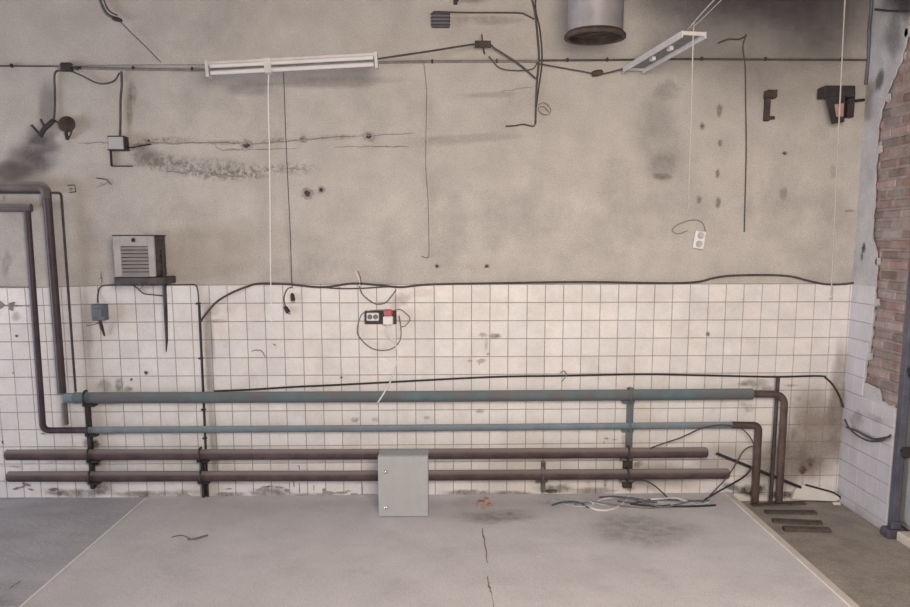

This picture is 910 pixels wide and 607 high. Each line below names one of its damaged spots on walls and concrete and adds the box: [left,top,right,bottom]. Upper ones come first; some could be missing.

spalling [865,28,910,408]
crack [482,528,494,607]